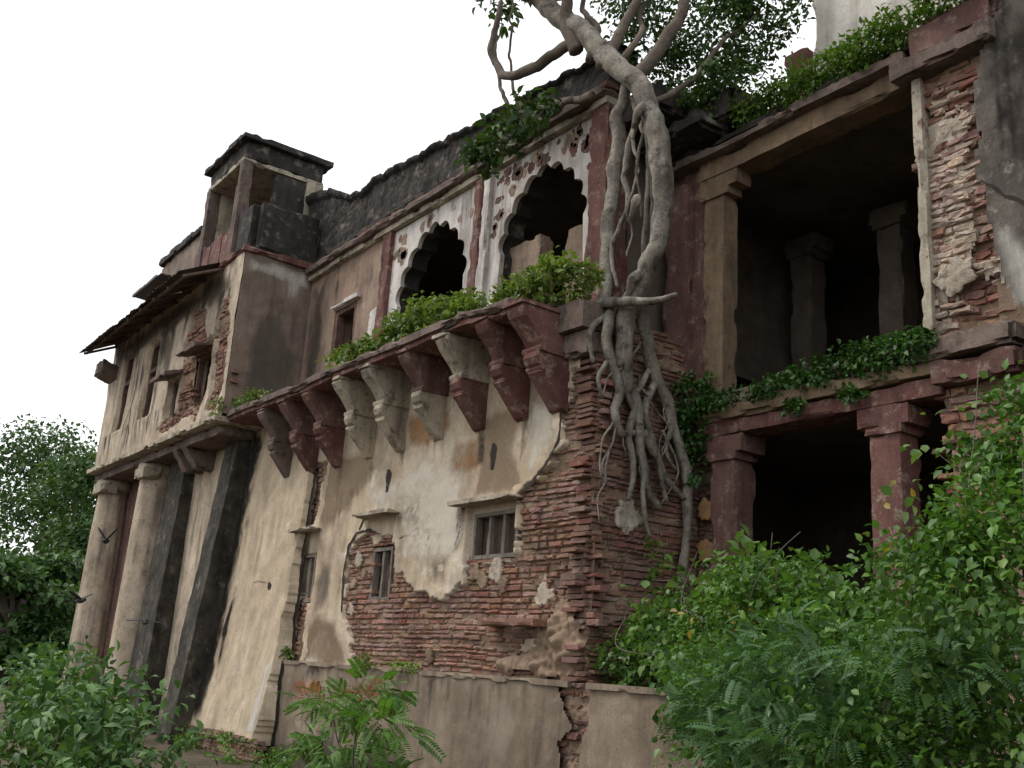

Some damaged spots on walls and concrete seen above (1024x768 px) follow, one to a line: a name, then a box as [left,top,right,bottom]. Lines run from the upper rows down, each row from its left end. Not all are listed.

peeling [490,123,591,239]
flaking render [915,81,1006,334]
flaking render [157,291,240,433]
leakage [213,603,232,659]
leakage [247,664,270,732]
flaking render [344,368,643,768]